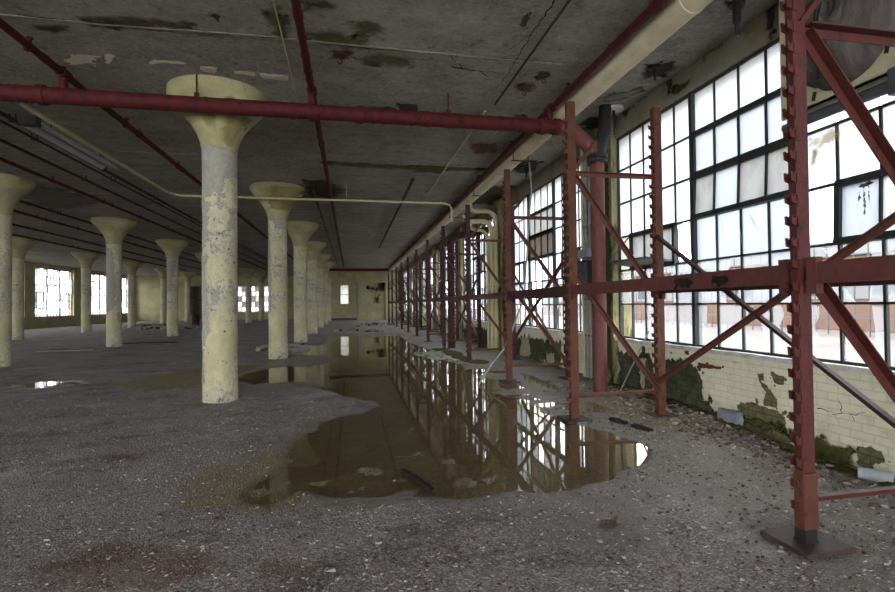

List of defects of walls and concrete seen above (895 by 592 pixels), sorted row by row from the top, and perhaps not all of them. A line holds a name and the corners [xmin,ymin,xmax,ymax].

flaking render [63,51,115,67]
flaking render [234,71,288,82]
mould [306,21,410,67]
crack [451,0,582,93]
peeling [201,145,238,384]